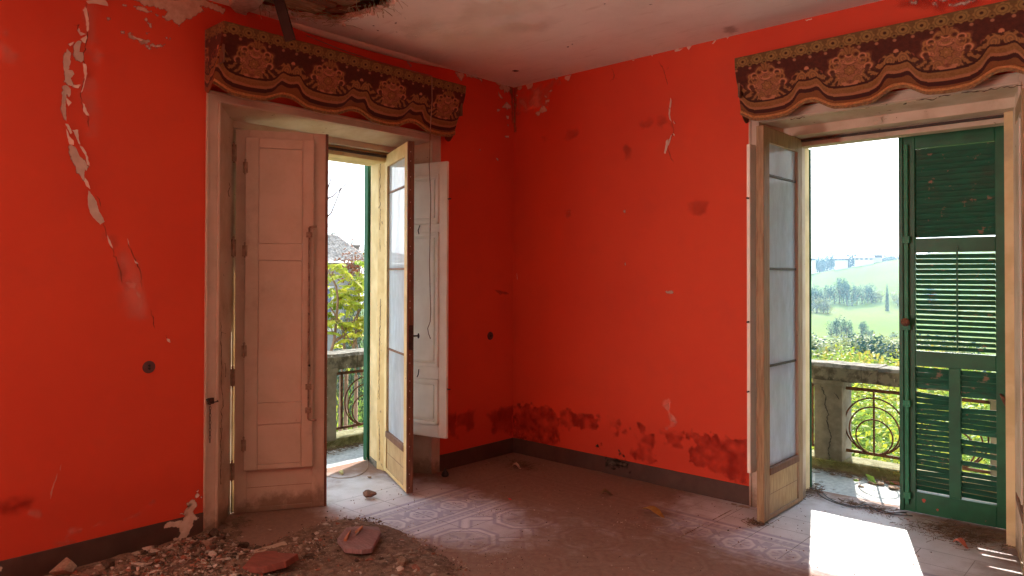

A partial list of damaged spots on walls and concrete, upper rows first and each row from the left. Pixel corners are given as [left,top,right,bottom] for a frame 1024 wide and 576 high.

spalling [121,0,406,49]
crack [61,0,142,286]
crack [820,386,839,460]
peeling [164,490,202,539]